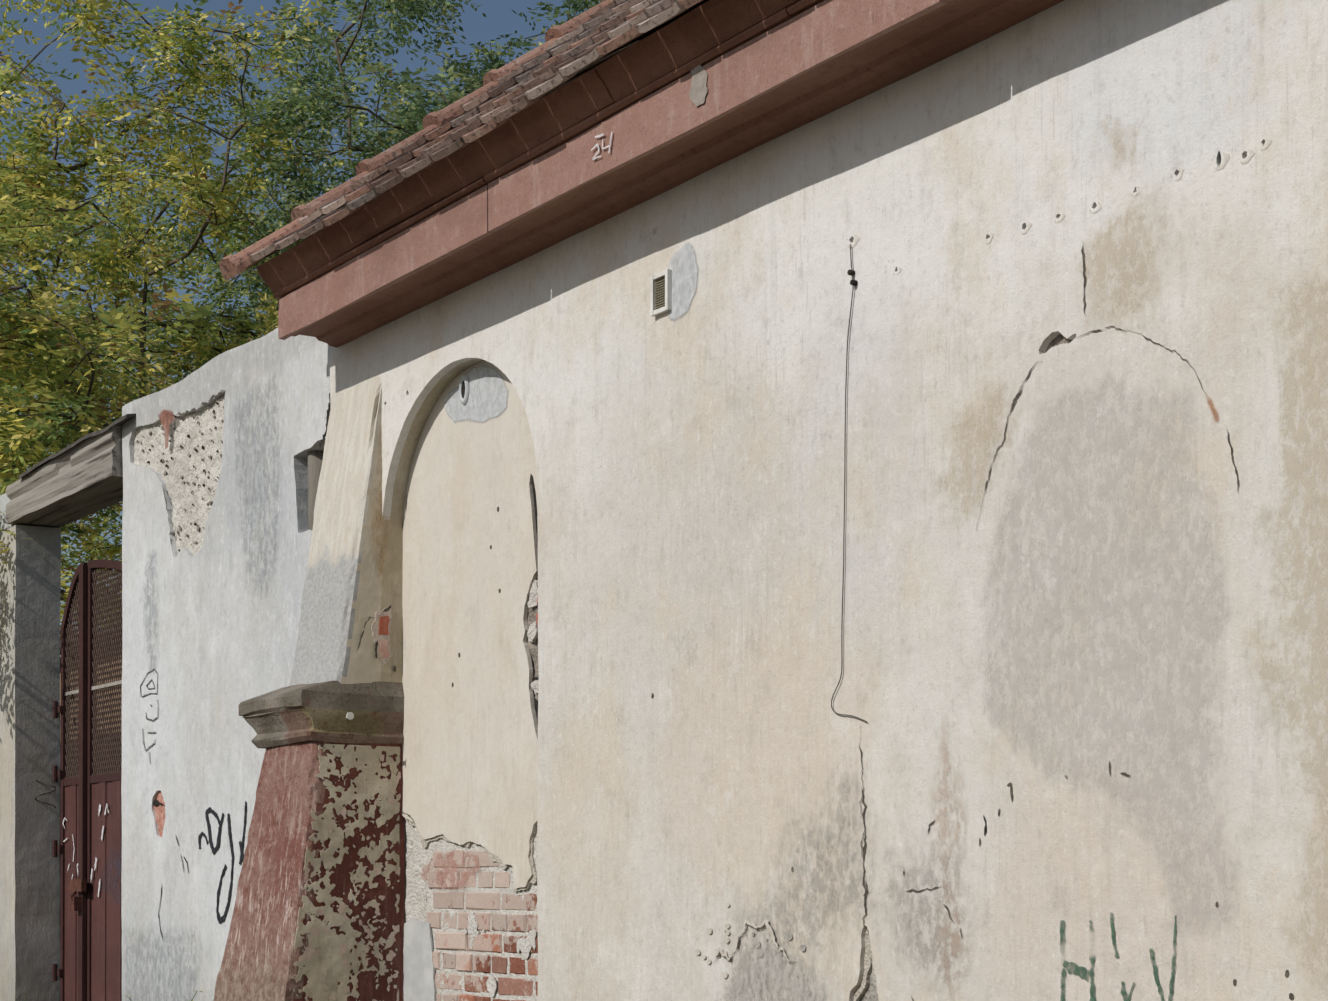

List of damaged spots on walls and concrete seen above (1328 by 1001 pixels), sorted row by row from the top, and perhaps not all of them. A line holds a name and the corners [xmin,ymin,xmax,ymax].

crack [1075,246,1206,394]
spalling [133,394,225,555]
crack [977,361,1042,523]
crack [1227,431,1239,492]
flaking render [357,605,396,672]
spalling [527,575,539,723]
flaking render [153,791,165,837]
peeling [290,744,538,1001]
crack [859,729,868,926]
spalling [853,927,879,1001]